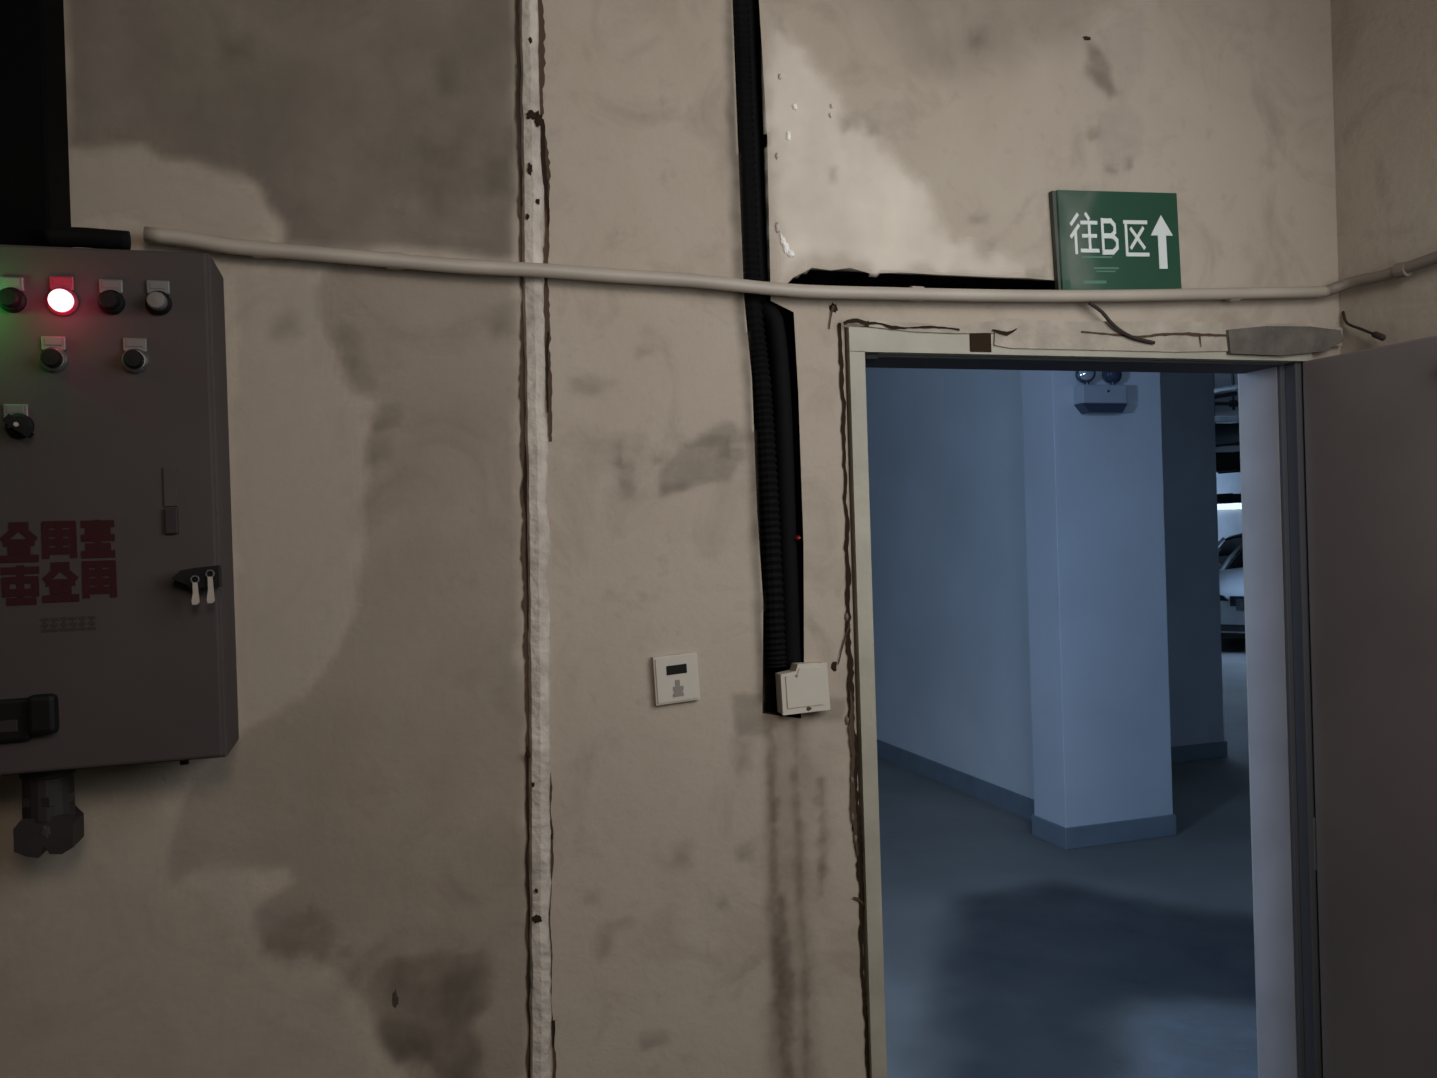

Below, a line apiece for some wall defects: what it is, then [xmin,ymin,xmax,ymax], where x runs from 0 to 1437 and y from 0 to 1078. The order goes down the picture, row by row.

crack [515,0,557,1078]